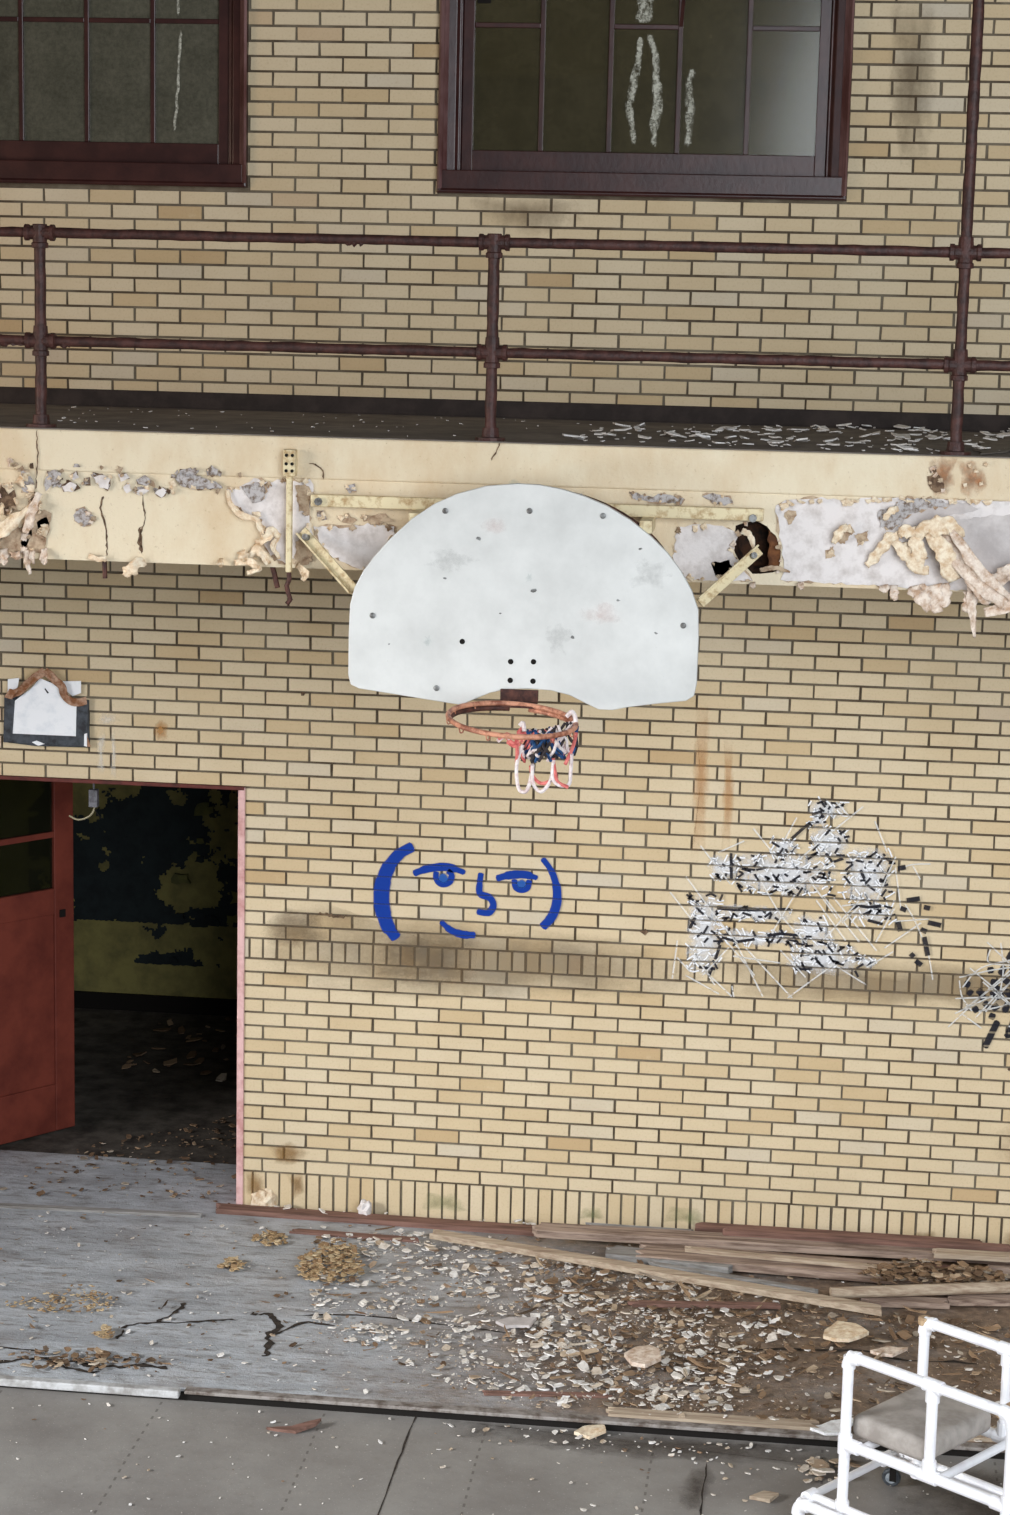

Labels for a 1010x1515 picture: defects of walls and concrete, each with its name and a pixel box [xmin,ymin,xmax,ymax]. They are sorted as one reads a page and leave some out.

peeling [0,458,396,582]
peeling [629,491,734,506]
peeling [672,495,1010,638]
crack [0,1303,506,1373]